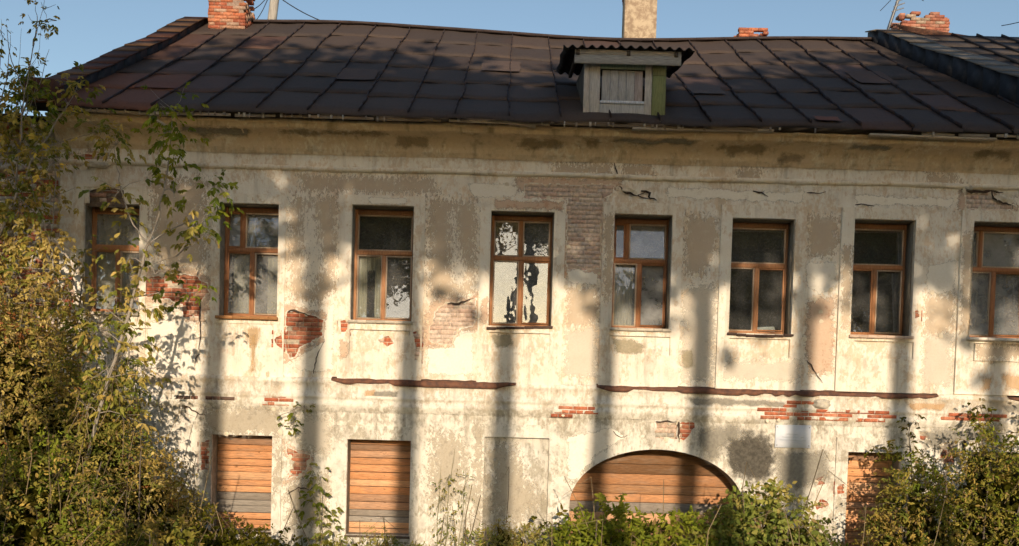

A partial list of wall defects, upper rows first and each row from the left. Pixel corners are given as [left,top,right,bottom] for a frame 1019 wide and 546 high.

spalling [957,190,1019,211]
peeling [130,171,211,371]
peeling [271,171,489,377]
spalling [494,164,654,379]
peeling [680,212,854,384]
peeling [911,229,975,387]
peeling [176,395,334,532]
spalling [551,404,598,418]
peeling [566,428,629,482]
spalling [654,421,695,443]
damp [701,426,827,488]
spalling [757,398,897,422]